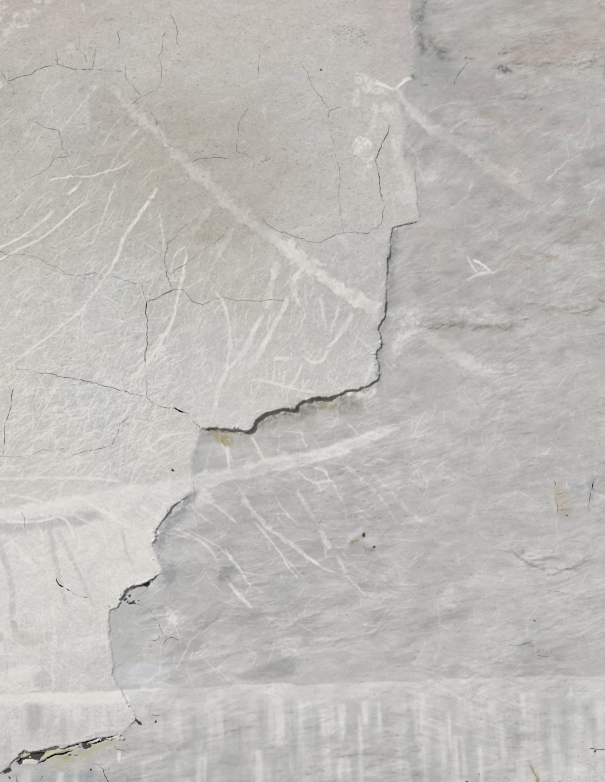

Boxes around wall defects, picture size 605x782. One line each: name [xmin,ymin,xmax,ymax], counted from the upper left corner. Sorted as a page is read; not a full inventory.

crack [265,129,389,243]
crack [114,224,226,361]
peeling [342,381,377,401]
peeling [382,304,430,370]
peeling [452,304,513,327]
peeling [452,352,529,381]
peeling [544,473,598,520]
damp [23,704,83,755]
crack [1,735,124,781]
damp [152,697,384,782]
damp [403,697,528,782]
damp [518,685,605,782]